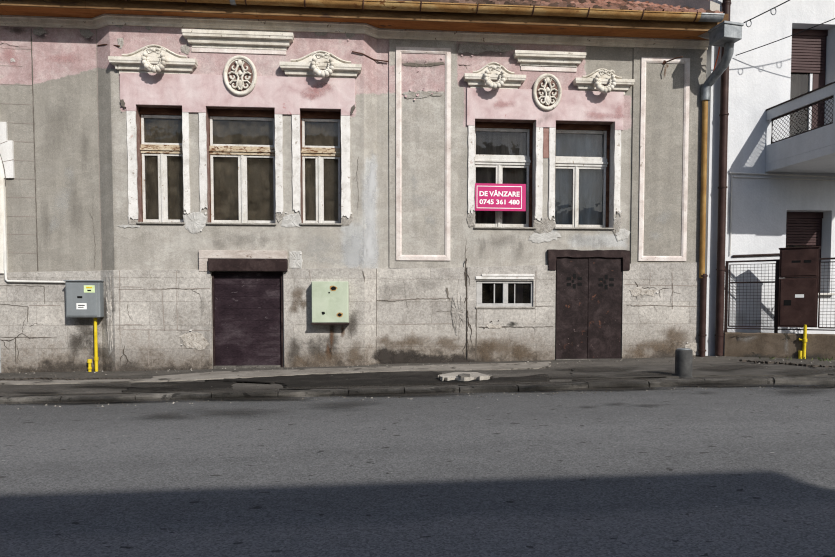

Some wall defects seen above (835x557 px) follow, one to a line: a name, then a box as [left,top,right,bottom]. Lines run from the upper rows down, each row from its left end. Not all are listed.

peeling [402,57,444,72]
peeling [402,88,443,100]
flaking render [183,212,207,234]
crack [379,236,535,358]
crack [0,317,144,381]
flaking render [179,330,209,350]
water stain [374,339,474,364]